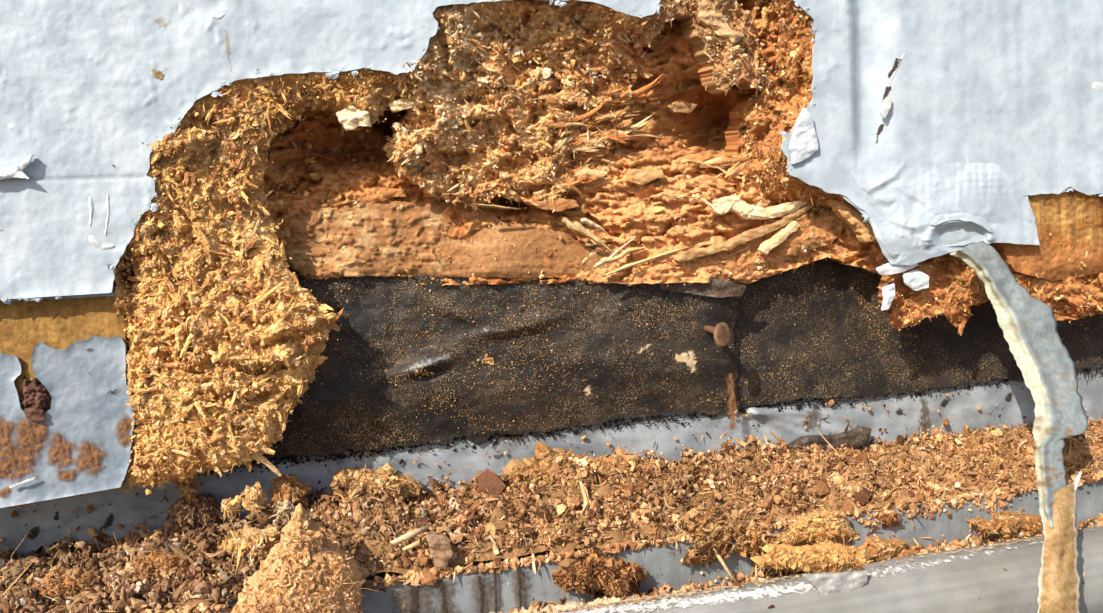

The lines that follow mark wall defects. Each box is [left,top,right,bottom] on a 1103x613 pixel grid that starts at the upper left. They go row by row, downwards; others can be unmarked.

spalling [107,0,889,495]
corrosion [727,373,737,430]
peeling [876,187,1103,613]